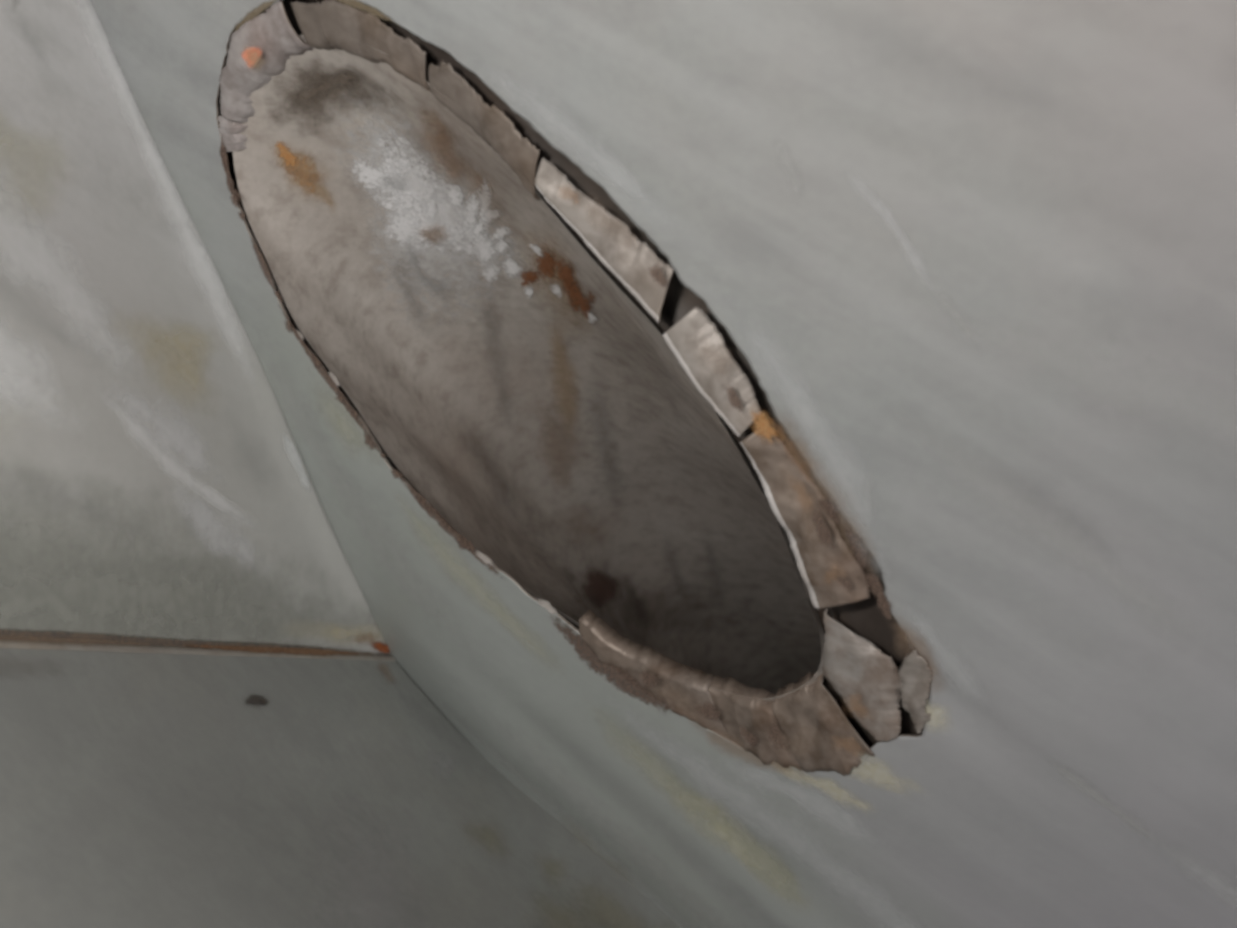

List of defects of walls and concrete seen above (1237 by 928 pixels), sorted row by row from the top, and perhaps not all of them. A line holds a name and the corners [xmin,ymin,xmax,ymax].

rust [242,48,261,67]
rust [275,143,317,193]
peeling [349,117,524,311]
rust [517,243,597,324]
peeling [247,695,268,705]